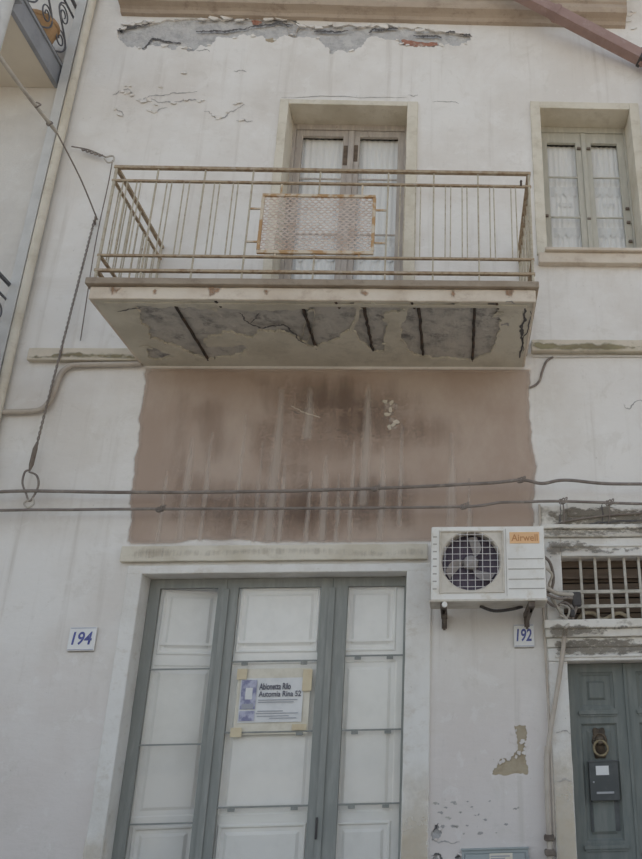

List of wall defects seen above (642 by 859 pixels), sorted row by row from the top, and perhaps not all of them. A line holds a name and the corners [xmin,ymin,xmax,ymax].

flaking render [118,16,472,54]
peeling [113,85,251,122]
spalling [136,302,504,362]
leakage [129,369,536,543]
leakage [546,506,642,557]
peeling [492,725,528,776]
flaking render [431,801,487,840]